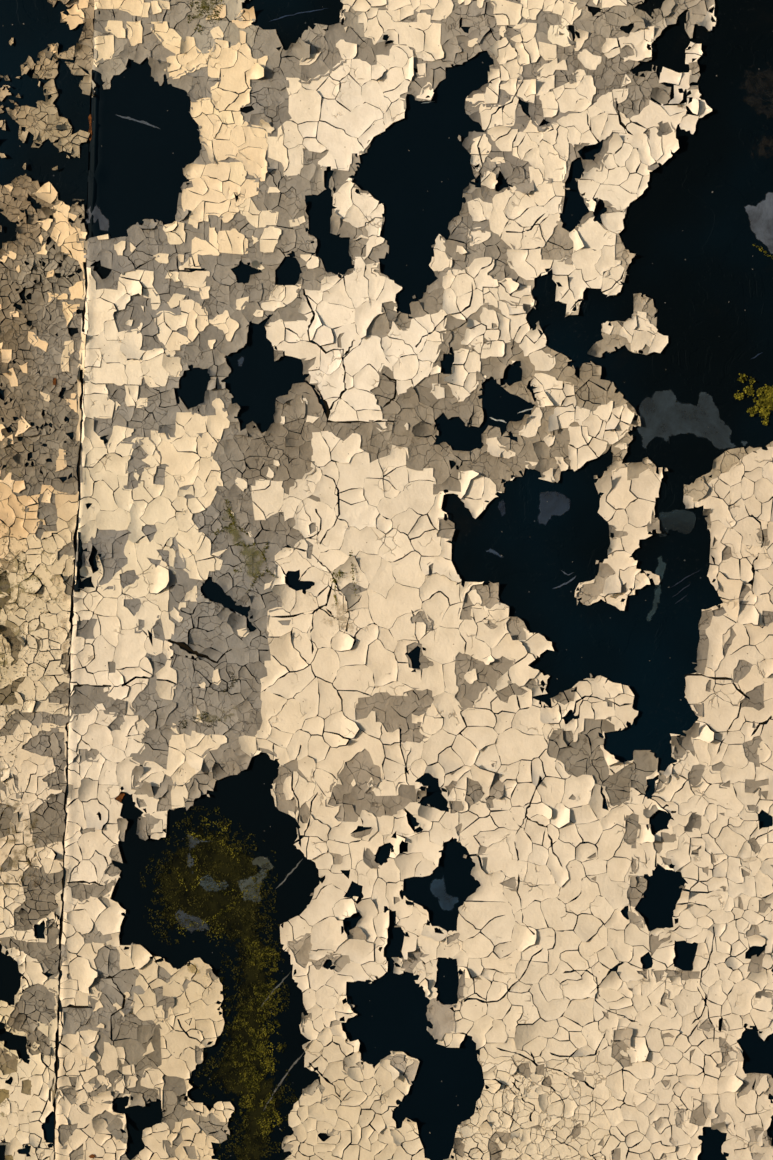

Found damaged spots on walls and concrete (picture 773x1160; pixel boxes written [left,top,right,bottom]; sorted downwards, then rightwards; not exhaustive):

crack [587,103,632,142]
peeling [744,192,773,254]
crack [80,262,88,335]
peeling [0,0,736,621]
crack [304,292,397,424]
crack [748,520,764,588]
crack [169,640,226,663]
crack [278,578,360,653]
crack [53,370,126,1160]
peeling [0,348,773,1160]
crack [684,673,772,754]
crack [514,780,562,933]